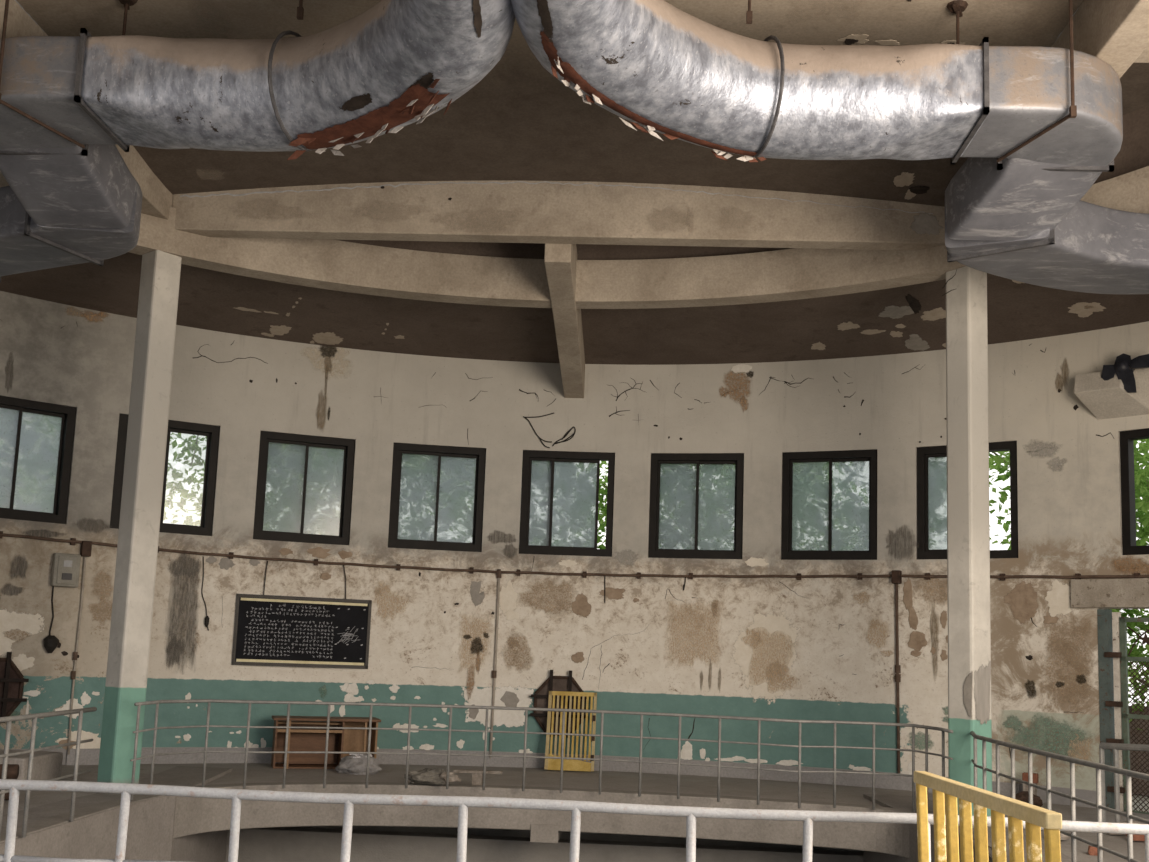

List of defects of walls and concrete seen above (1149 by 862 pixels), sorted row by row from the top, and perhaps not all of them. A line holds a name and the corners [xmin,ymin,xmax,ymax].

spalling [838,294,946,351]
damp [316,345,347,429]
damp [170,553,199,577]
peeling [0,609,45,671]
damp [167,637,182,665]
damp [730,609,801,704]
peeling [0,690,40,724]
peeling [393,686,536,750]